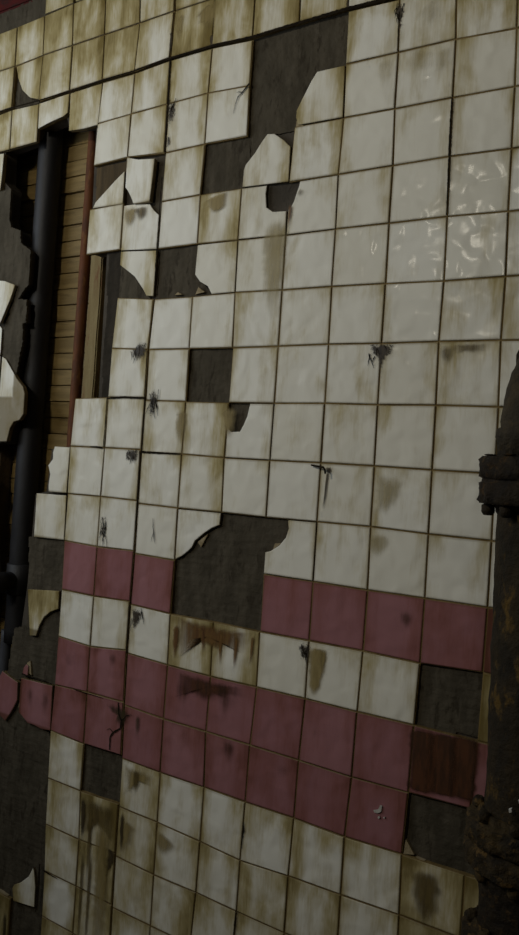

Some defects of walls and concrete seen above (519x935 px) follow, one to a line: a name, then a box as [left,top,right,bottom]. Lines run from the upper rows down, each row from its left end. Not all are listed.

crack [0,0,400,152]
spalling [203,10,353,195]
crack [445,98,453,215]
crack [153,179,162,299]
spalling [102,245,213,398]
spalling [188,349,254,432]
crack [90,351,181,652]
spalling [173,512,290,631]
rust [173,622,240,663]
leakage [128,771,148,789]
leakage [78,801,131,935]
leakage [414,873,438,918]